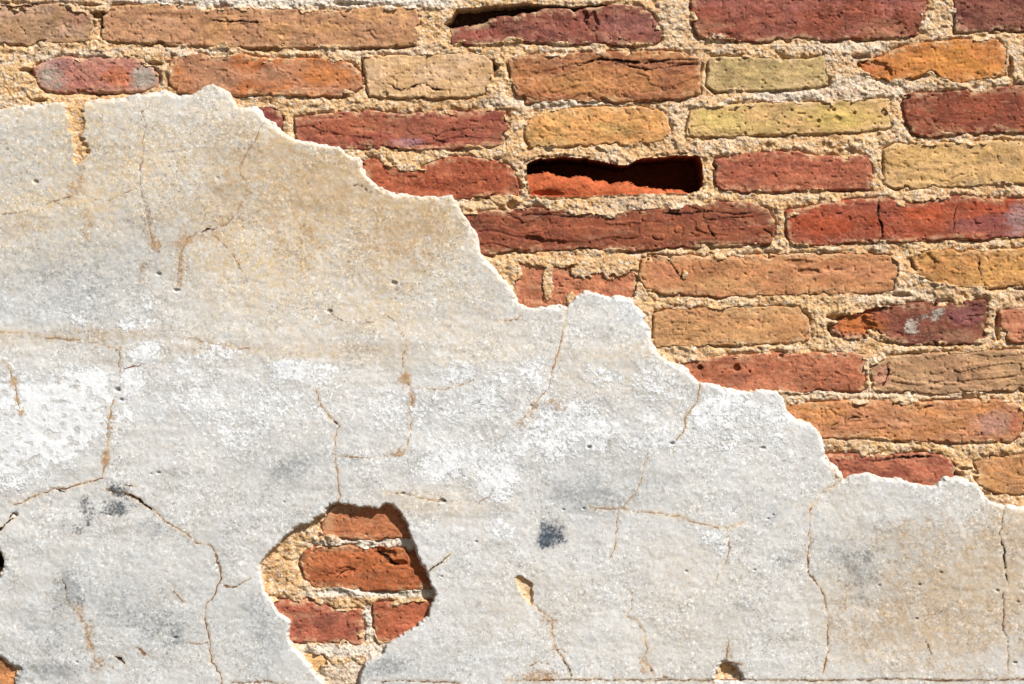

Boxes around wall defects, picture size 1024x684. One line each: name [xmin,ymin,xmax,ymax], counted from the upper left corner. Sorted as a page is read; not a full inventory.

peeling [449,9,538,29]
spalling [858,53,897,82]
crack [3,332,140,371]
crack [316,307,474,504]
peeling [0,84,1024,548]
crack [0,400,284,684]
spalling [259,502,437,684]
crack [378,551,400,565]
water stain [537,522,566,549]
crack [591,452,741,577]
crack [515,508,1024,682]
crack [380,676,455,684]